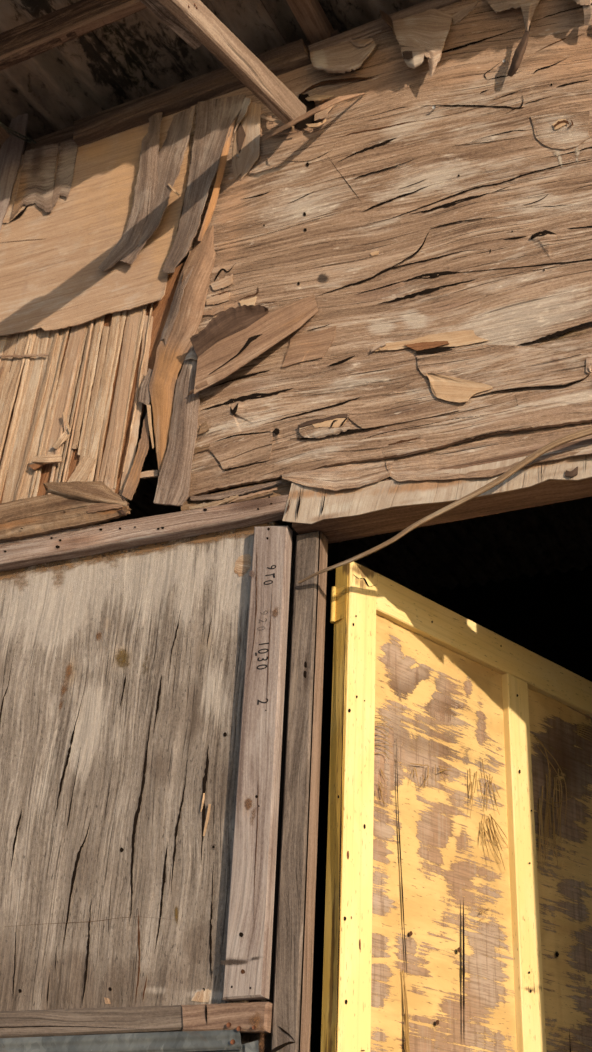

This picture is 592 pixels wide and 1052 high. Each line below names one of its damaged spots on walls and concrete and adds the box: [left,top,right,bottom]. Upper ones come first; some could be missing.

peeling [310,38,376,73]
peeling [162,95,251,273]
crack [203,6,592,316]
spalling [0,303,153,503]
crack [201,355,590,445]
crack [517,321,592,346]
peeling [565,446,592,477]
crack [0,610,214,1029]
crack [396,738,407,972]
peeling [370,635,515,1052]
crack [459,899,467,1034]
peeling [530,706,592,1052]